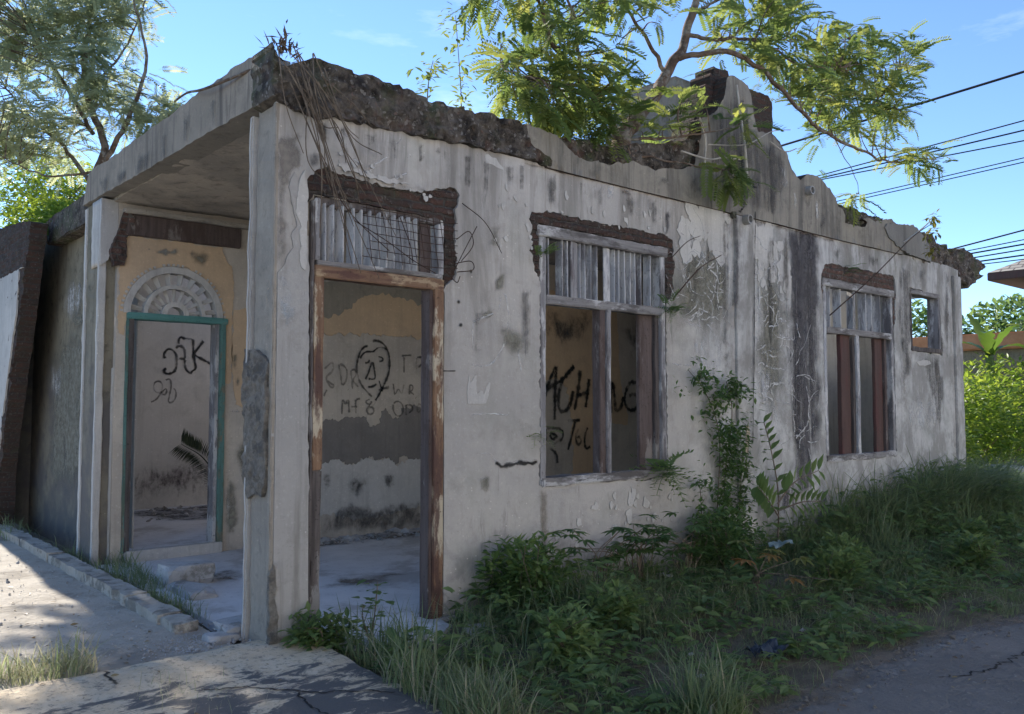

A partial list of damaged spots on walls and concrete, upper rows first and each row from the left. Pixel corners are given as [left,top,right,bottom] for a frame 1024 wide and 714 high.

spalling [250,42,552,170]
water stain [715,105,785,212]
spalling [498,183,737,304]
flaking render [109,139,458,645]
water stain [768,206,825,488]
water stain [335,505,420,529]
crack [942,652,1024,677]